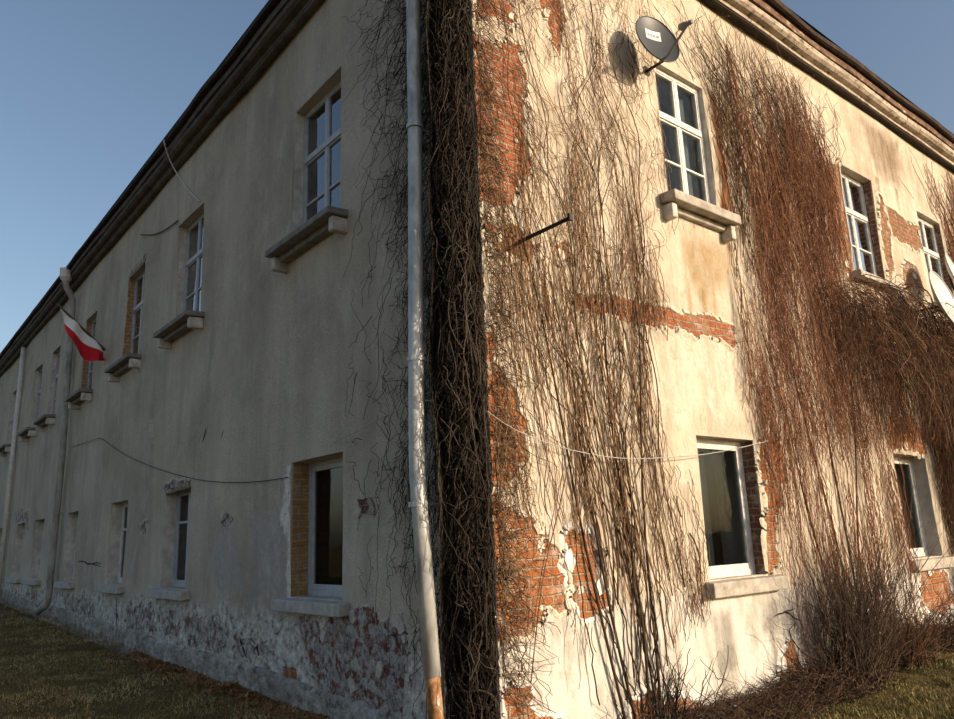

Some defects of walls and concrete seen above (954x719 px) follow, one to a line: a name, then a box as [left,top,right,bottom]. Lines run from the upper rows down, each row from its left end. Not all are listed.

spalling [472,0,579,270]
spalling [875,190,925,297]
spalling [571,287,737,351]
spalling [463,319,612,719]
spalling [123,600,271,666]
spalling [282,604,412,719]
spalling [438,621,465,719]
spalling [916,568,954,619]